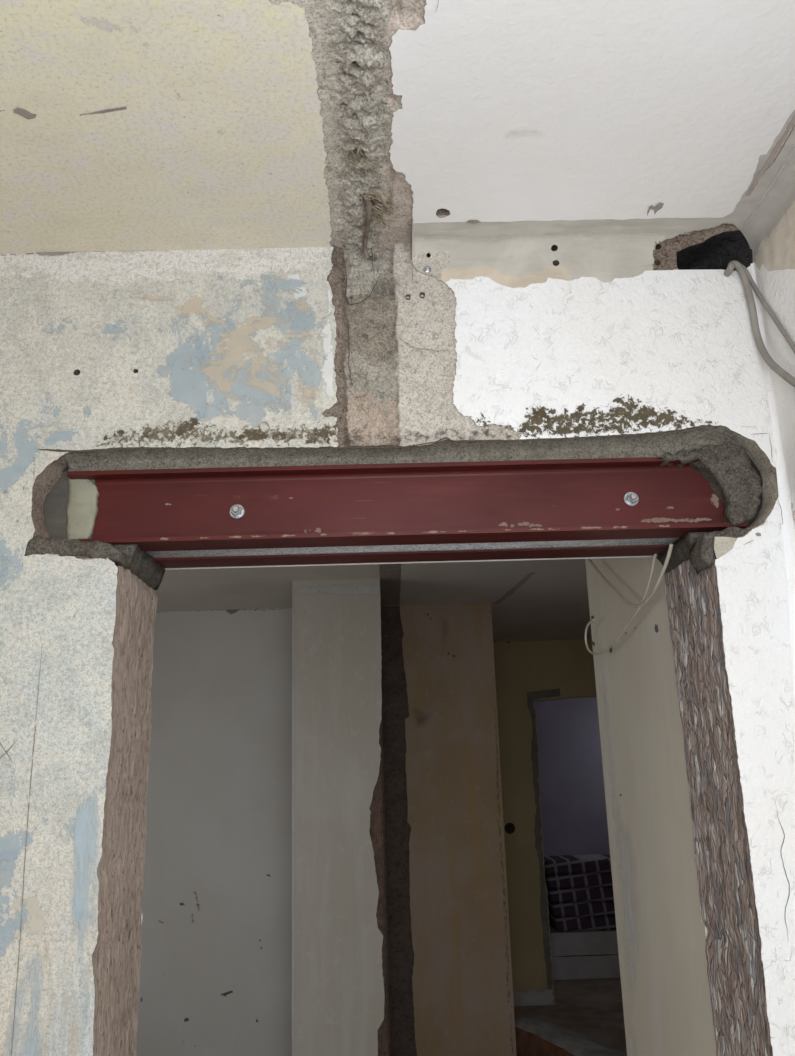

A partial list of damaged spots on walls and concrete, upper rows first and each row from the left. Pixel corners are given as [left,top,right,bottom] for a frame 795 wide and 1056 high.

spalling [129,0,521,449]
peeling [0,406,77,492]
peeling [0,830,34,870]
peeling [0,890,46,957]